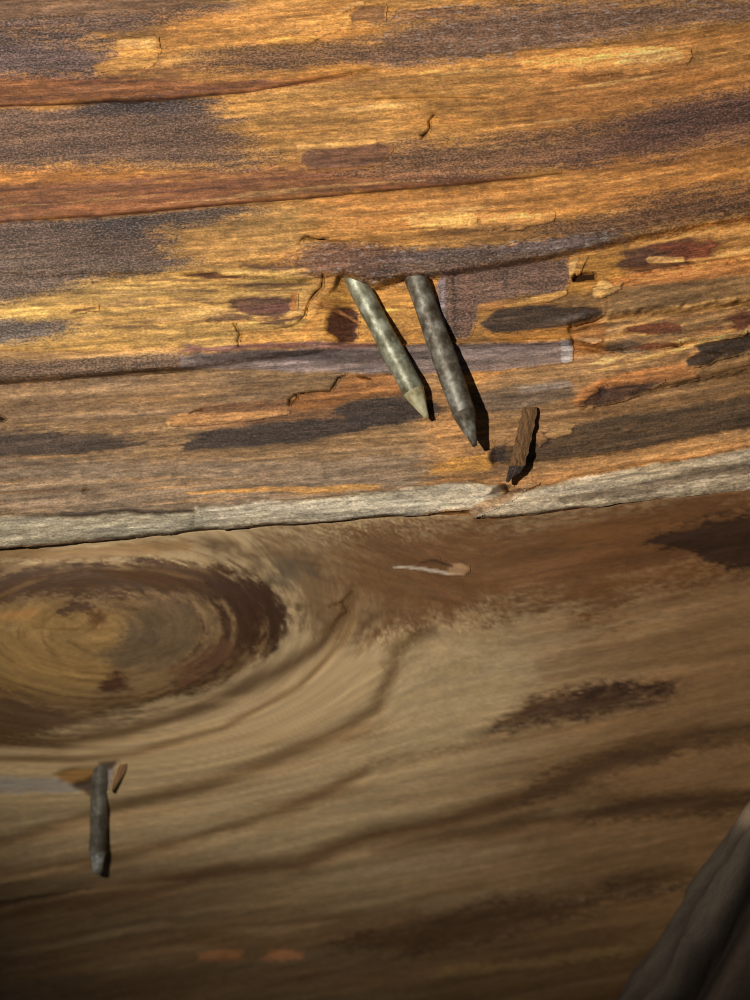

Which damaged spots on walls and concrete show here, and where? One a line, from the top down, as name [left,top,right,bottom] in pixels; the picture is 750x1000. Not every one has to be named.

crack [374,95,492,140]
crack [275,272,325,330]
crack [287,372,373,407]